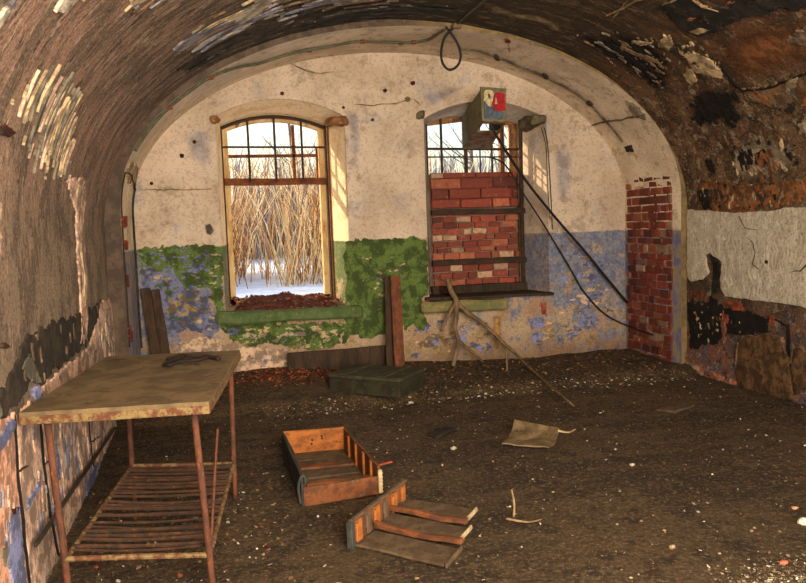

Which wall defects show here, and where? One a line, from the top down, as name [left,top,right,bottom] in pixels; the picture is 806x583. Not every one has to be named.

peeling [124,0,164,14]
peeling [173,0,458,71]
flaking render [631,0,806,137]
peeling [0,64,117,583]
peeling [120,160,500,372]
peeling [525,238,614,353]
flaking render [626,176,673,362]
peeling [686,355,739,387]